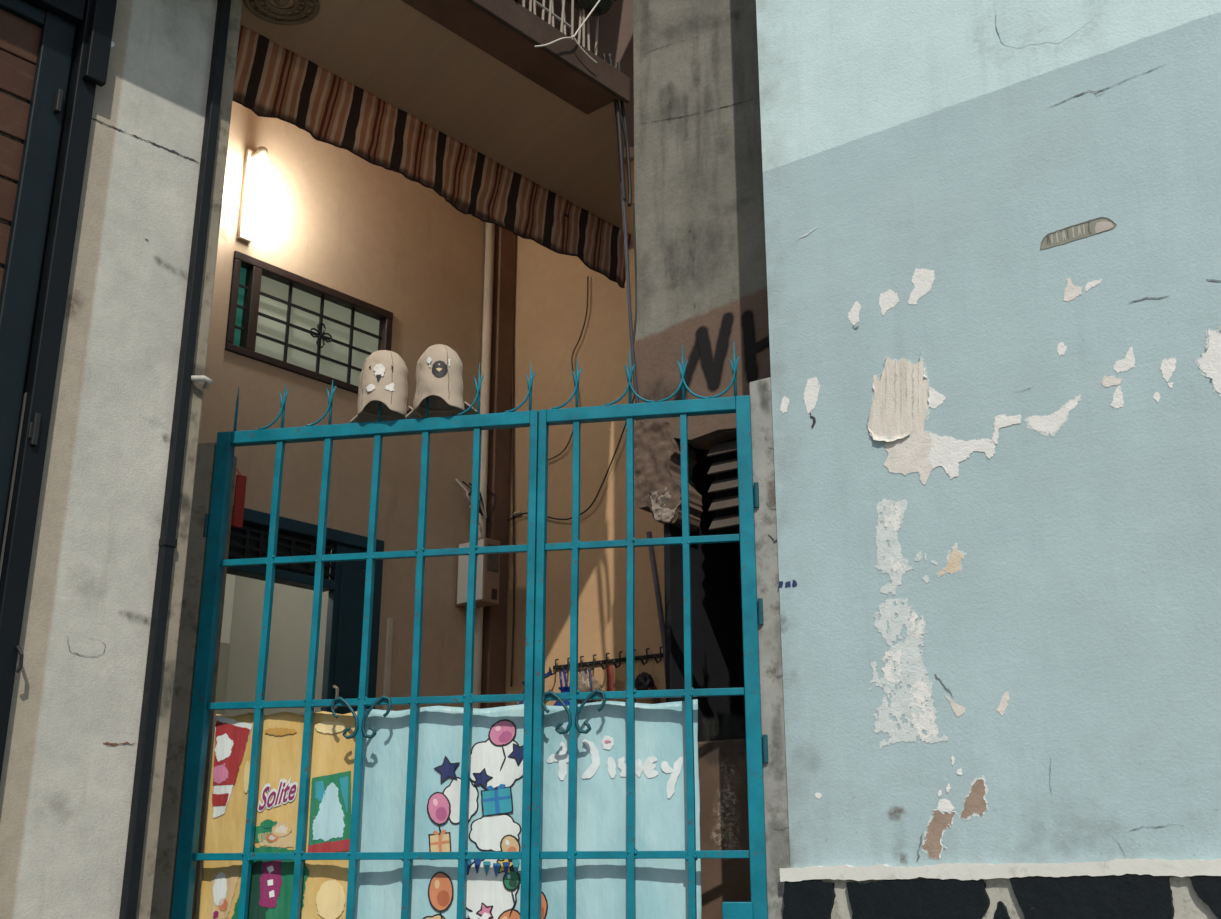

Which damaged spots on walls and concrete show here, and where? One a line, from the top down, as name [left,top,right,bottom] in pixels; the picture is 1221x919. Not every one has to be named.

crack [1051,65,1164,107]
crack [92,118,199,163]
peeling [848,301,861,329]
peeling [879,268,935,315]
peeling [1063,278,1102,302]
peeling [1101,347,1135,409]
peeling [1153,357,1177,402]
peeling [1195,326,1221,398]
peeling [866,352,1081,485]
peeling [866,498,967,749]
spalling [917,755,989,861]